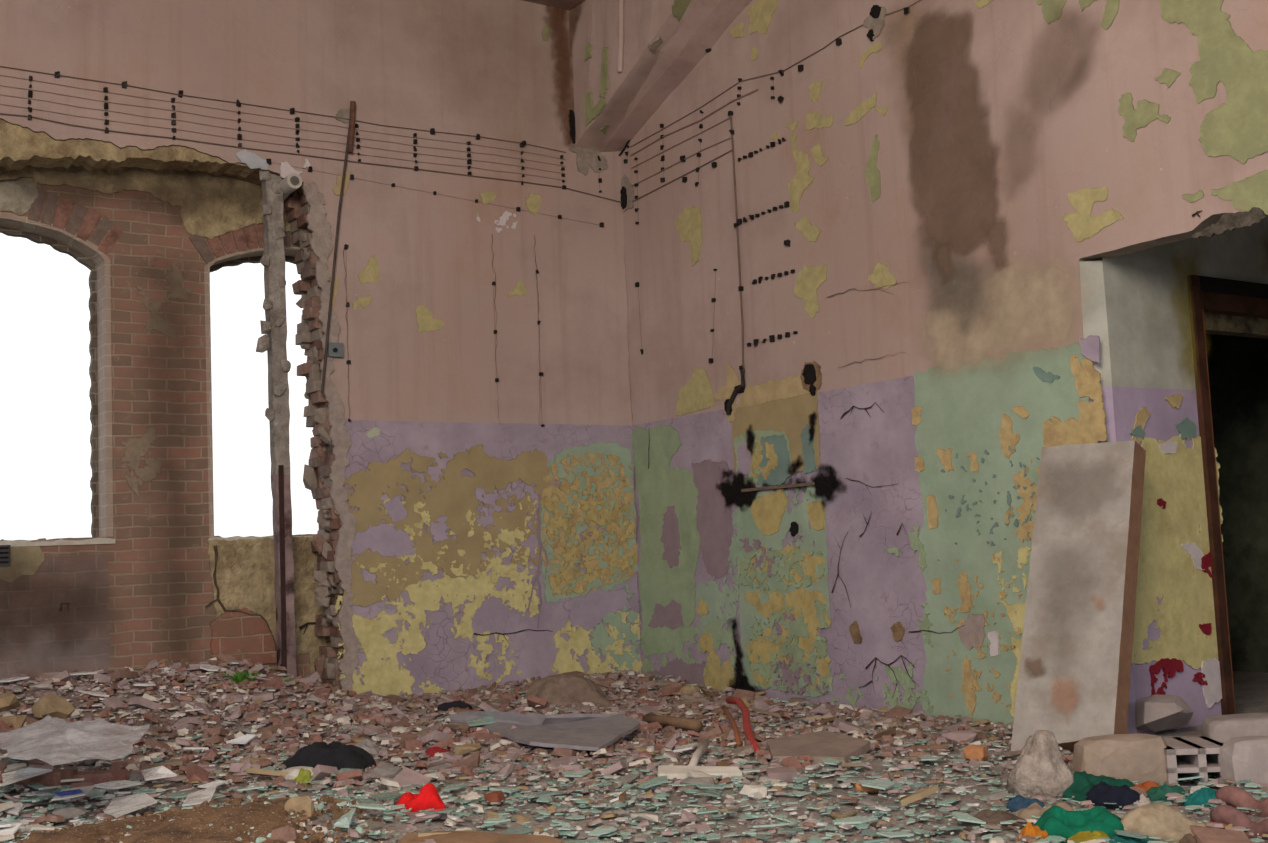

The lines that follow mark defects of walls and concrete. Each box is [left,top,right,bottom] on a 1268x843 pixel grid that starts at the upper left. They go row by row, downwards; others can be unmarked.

peeling [1036,0,1120,30]
flaking render [569,43,610,176]
peeling [1118,92,1171,142]
peeling [1154,0,1268,238]
damp [896,11,1072,369]
peeling [0,119,864,707]
crack [840,402,884,419]
crack [205,545,316,651]
crack [831,478,895,607]
crack [858,625,965,698]
peeling [876,335,1108,726]
peeling [1130,394,1223,708]